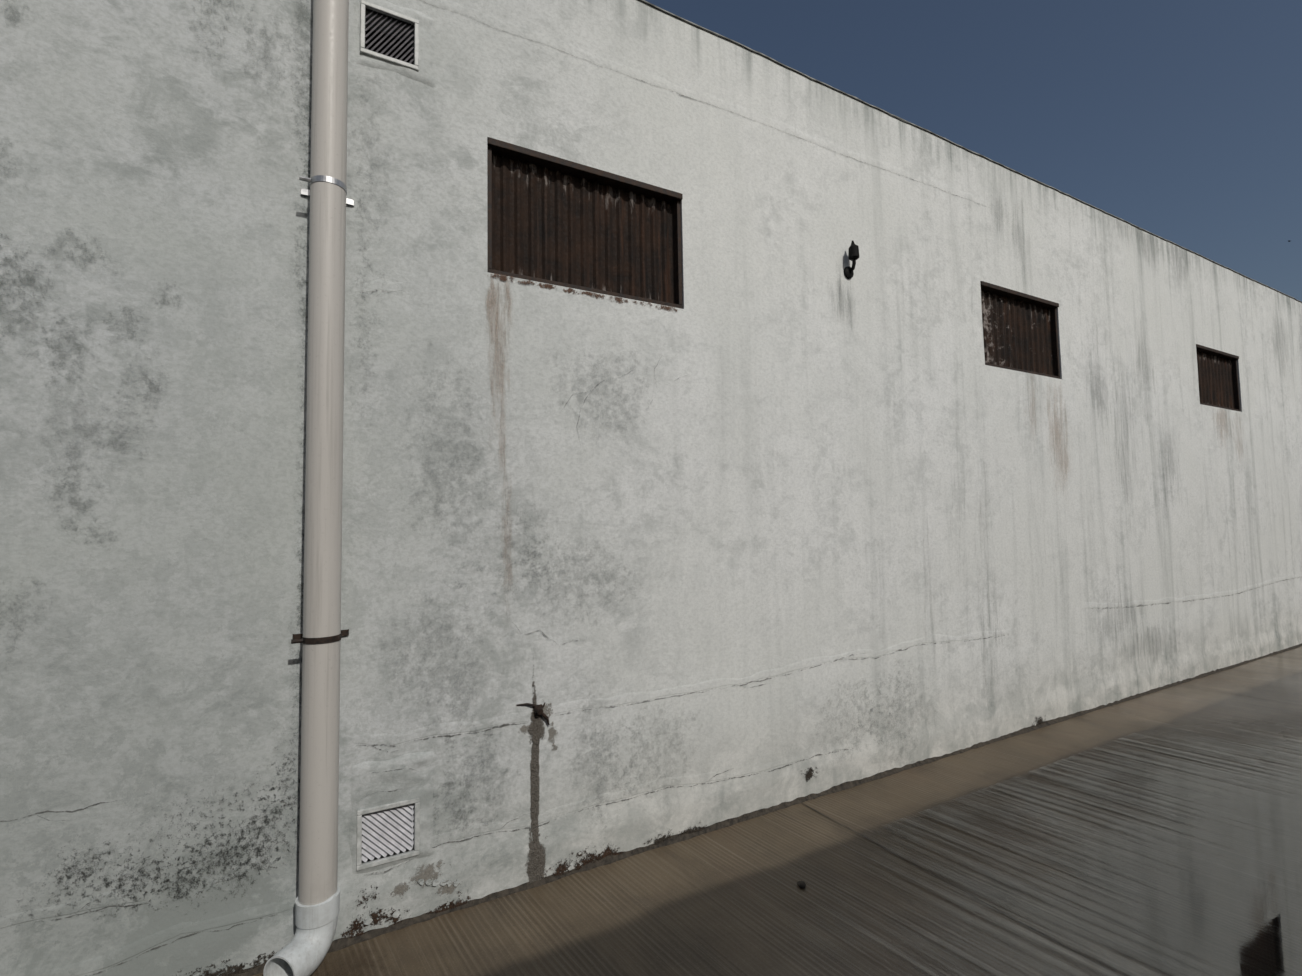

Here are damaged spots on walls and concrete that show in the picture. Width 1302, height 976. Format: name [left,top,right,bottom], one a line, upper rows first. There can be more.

crack [352,712,528,750]
crack [0,799,123,822]
water stain [55,758,299,915]
peeling [342,861,471,939]